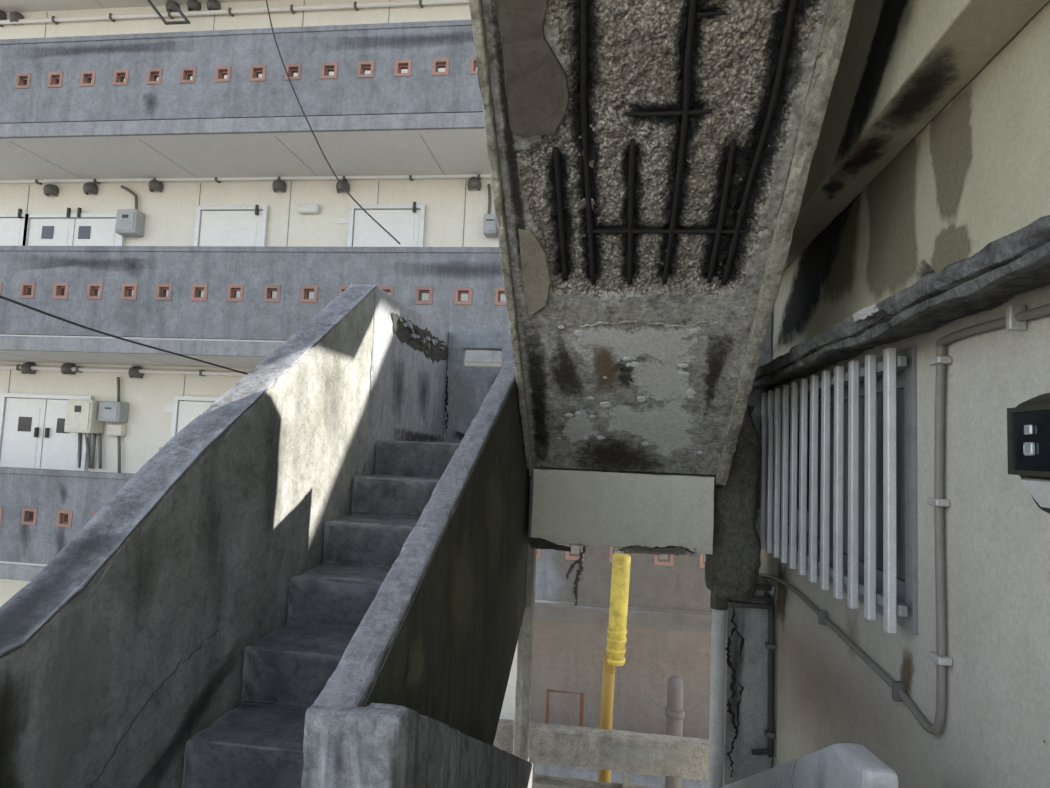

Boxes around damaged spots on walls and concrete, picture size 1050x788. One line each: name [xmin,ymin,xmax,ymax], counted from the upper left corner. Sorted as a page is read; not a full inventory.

damp [777,0,971,346]
spalling [482,0,830,475]
spalling [852,304,879,321]
damp [524,332,584,459]
damp [618,359,645,388]
damp [704,336,732,414]
damp [576,436,663,474]
crack [566,546,586,606]
crack [725,599,745,777]